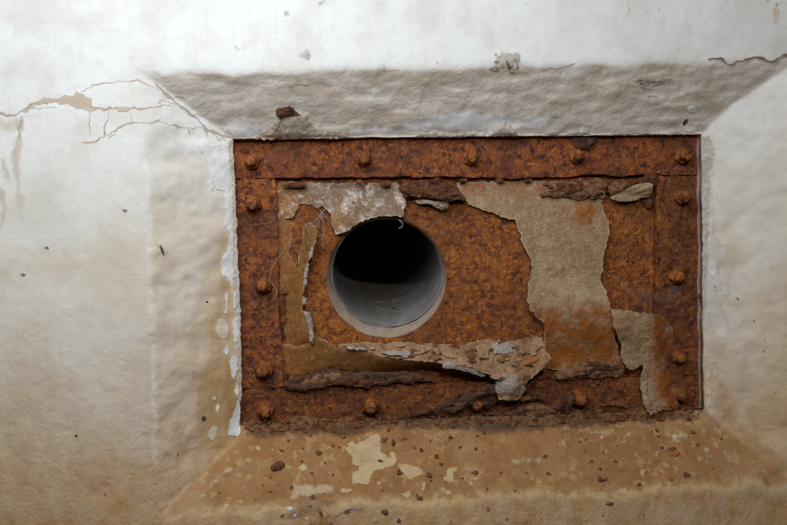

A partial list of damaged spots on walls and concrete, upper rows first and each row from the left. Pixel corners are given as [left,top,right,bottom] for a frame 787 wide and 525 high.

spalling [489,53,520,73]
crack [708,53,787,66]
spalling [633,77,673,90]
crack [0,79,235,143]
spalling [255,106,349,140]
spalling [413,121,517,137]
spalling [541,127,716,332]
peeling [198,140,242,436]
peeling [277,180,679,415]
rust [270,461,285,472]
peeling [290,434,426,500]
peeling [441,467,457,495]